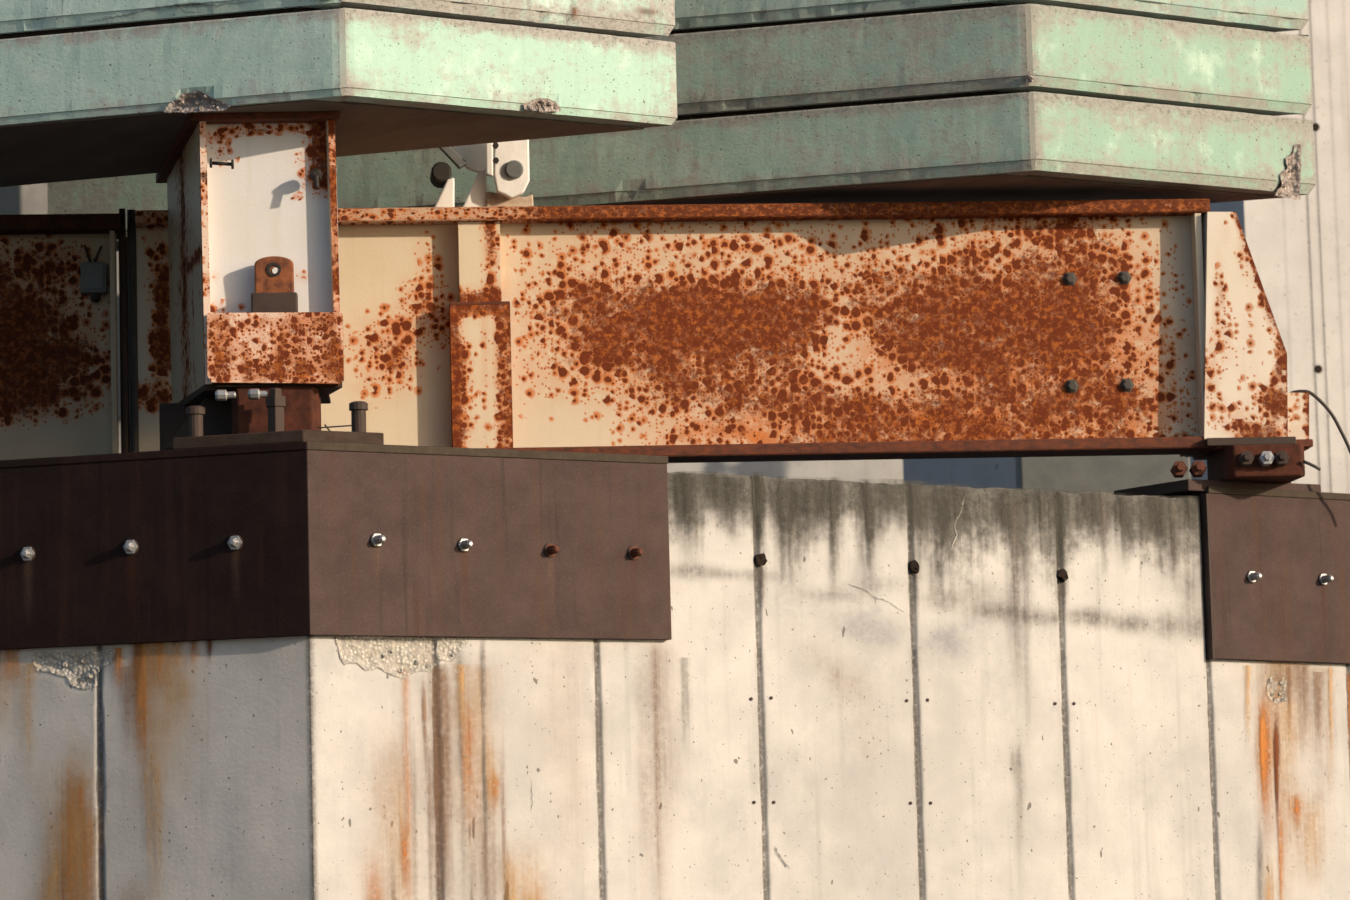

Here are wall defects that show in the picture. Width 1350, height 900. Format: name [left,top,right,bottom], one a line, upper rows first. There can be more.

spalling [164,91,230,113]
spalling [1275,143,1302,200]
water stain [674,472,736,532]
water stain [752,473,837,555]
water stain [862,479,967,575]
water stain [999,488,1067,617]
water stain [1145,495,1194,541]
spalling [32,650,116,690]
spalling [335,636,469,678]
rust [115,640,211,801]
rust [1247,665,1332,900]